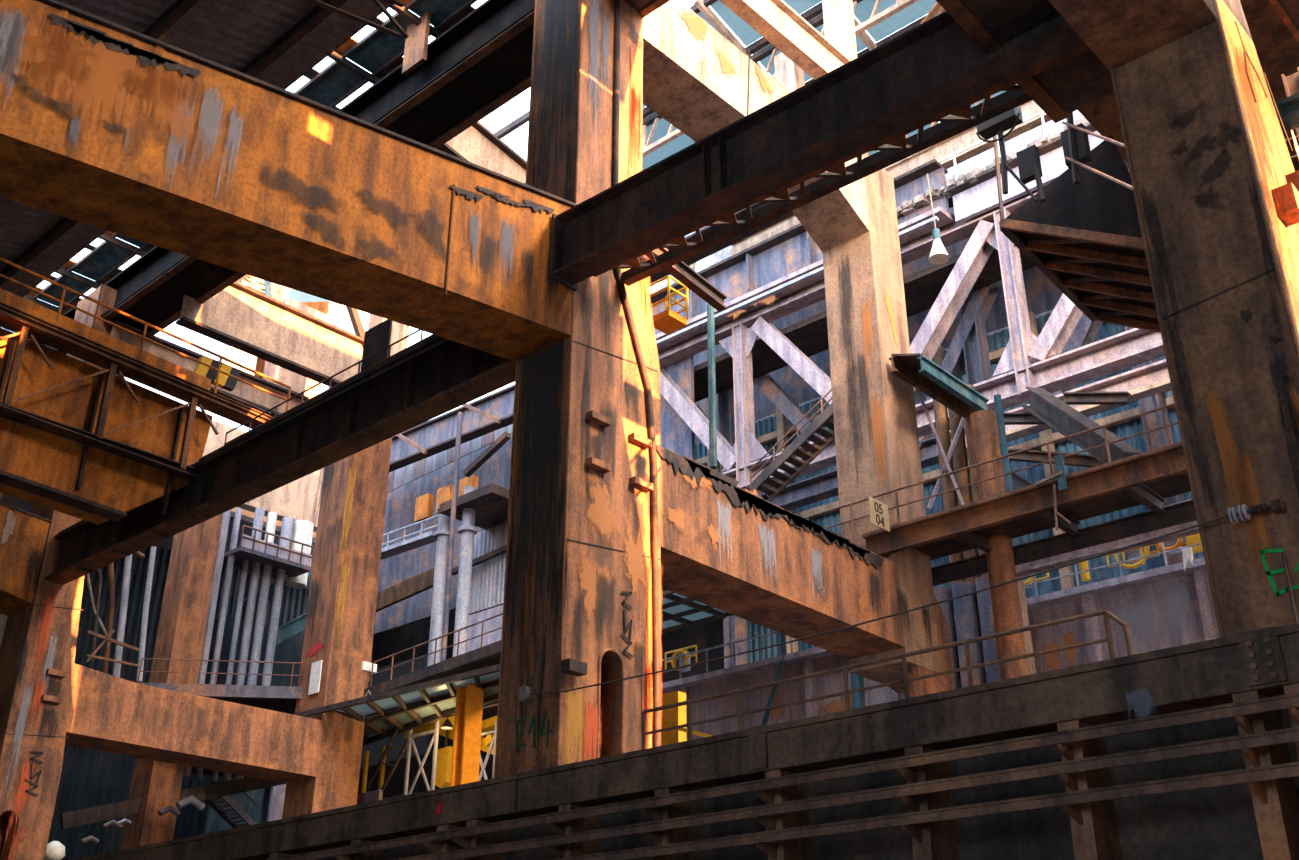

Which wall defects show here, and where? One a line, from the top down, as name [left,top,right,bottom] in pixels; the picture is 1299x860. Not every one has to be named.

damp [0,10,26,91]
damp [68,116,81,142]
damp [166,89,243,190]
rust [640,255,650,313]
peeling [1,509,16,545]
rust [334,467,357,629]
rust [511,405,519,506]
peeling [656,445,884,569]
rust [1208,394,1270,574]